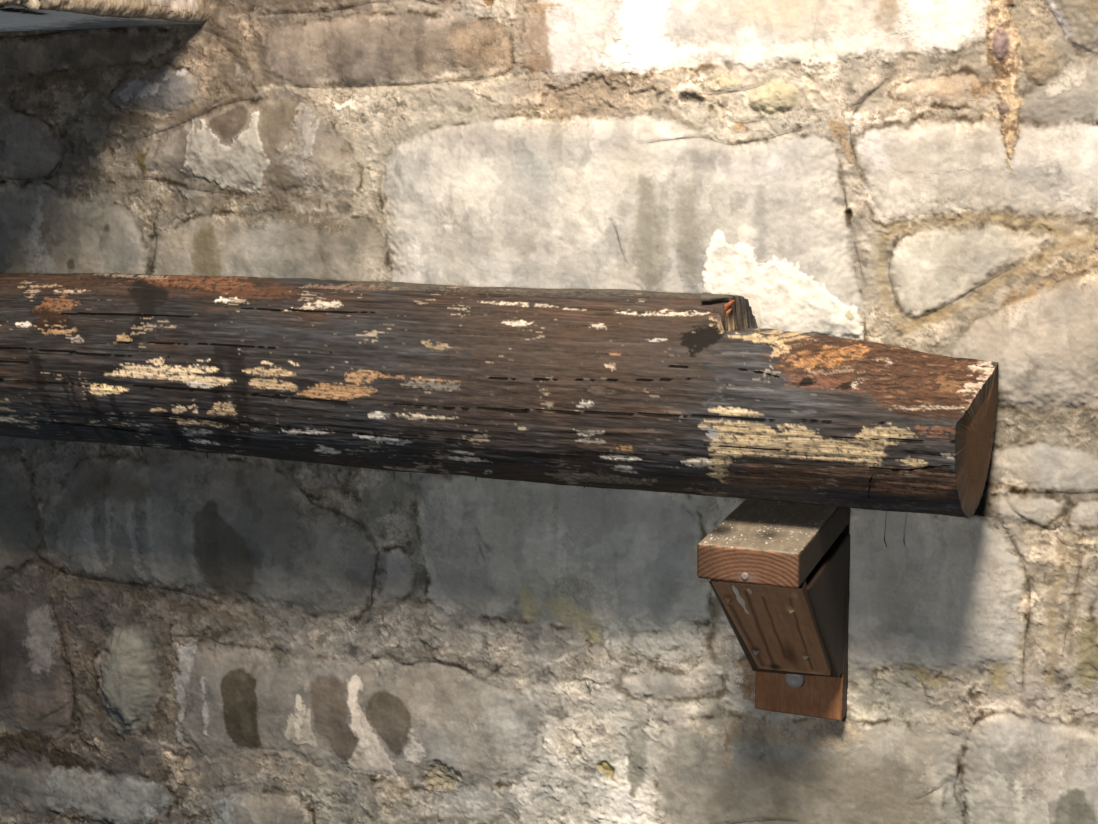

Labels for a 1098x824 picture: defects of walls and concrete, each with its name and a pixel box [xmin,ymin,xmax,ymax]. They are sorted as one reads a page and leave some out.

peeling [700,228,864,341]
leakage [1005,409,1098,439]
leakage [28,454,259,602]
leakage [868,539,1022,658]
leakage [283,672,427,781]
leakage [669,724,949,824]
leakage [963,770,1098,824]